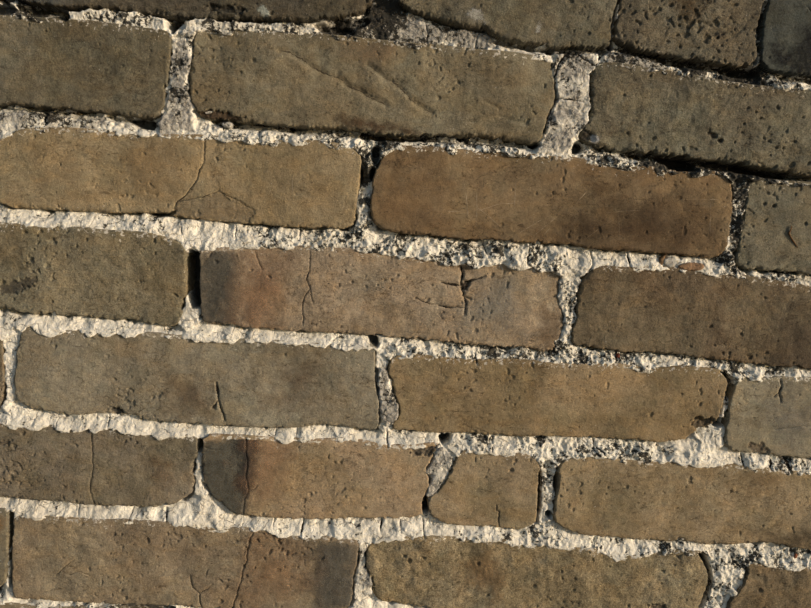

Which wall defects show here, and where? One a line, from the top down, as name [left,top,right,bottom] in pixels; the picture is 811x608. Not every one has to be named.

crack [174,140,248,208]
crack [417,266,484,314]
crack [78,414,110,515]